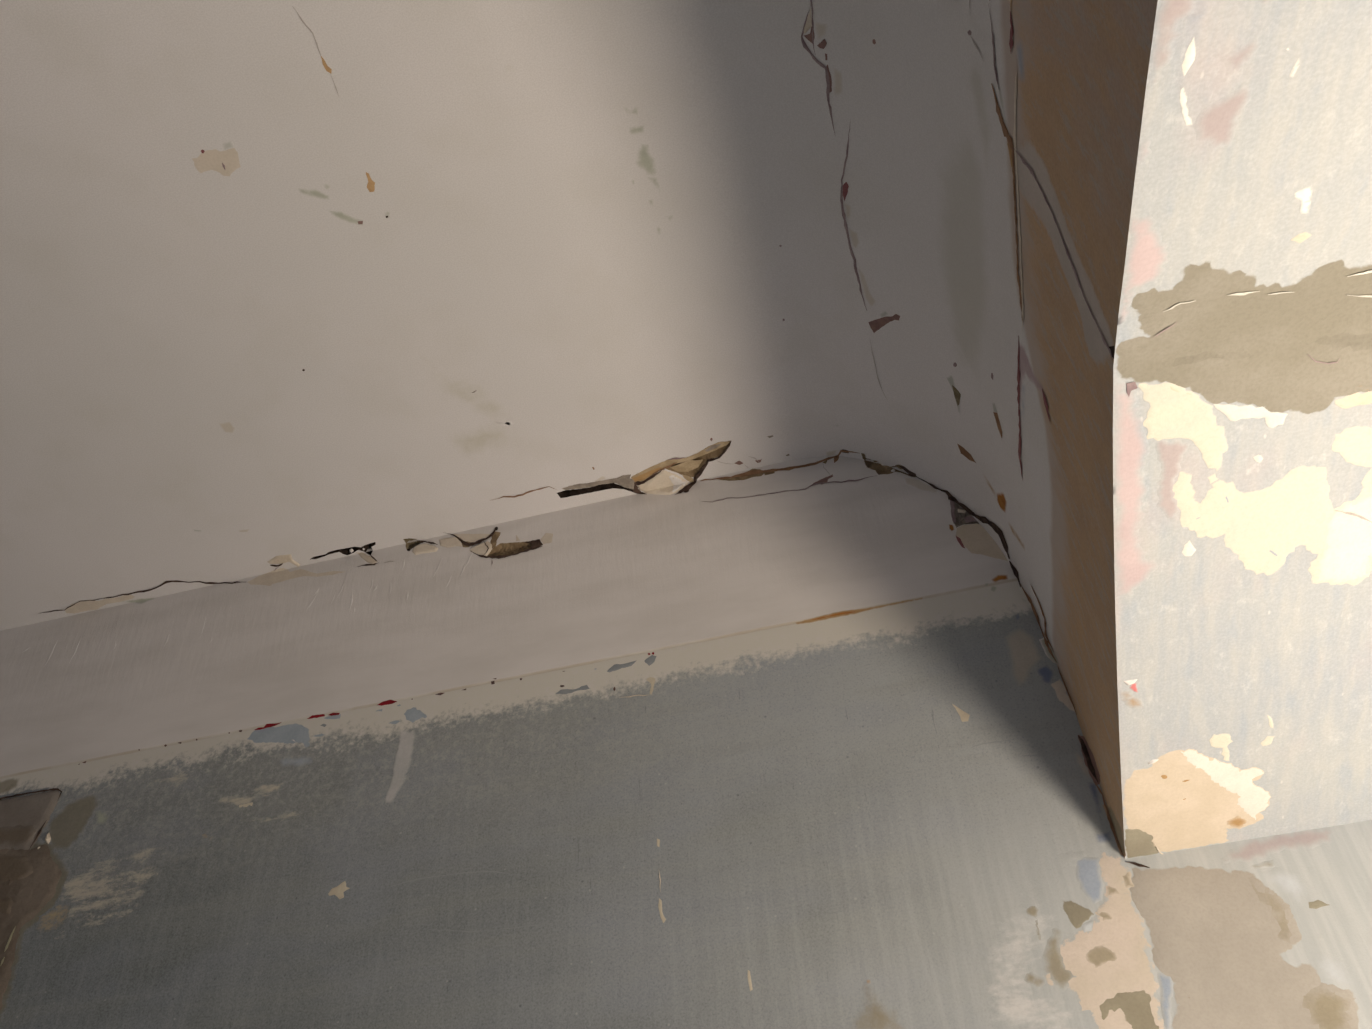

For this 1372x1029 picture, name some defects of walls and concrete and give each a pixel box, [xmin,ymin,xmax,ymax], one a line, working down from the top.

crack [801,0,887,399]
crack [968,0,1113,480]
flaking render [493,438,731,500]
peeling [1126,382,1372,586]
crack [38,554,343,614]
flaking render [1122,733,1336,917]
peeling [967,851,1190,1029]
peeling [1311,933,1361,993]